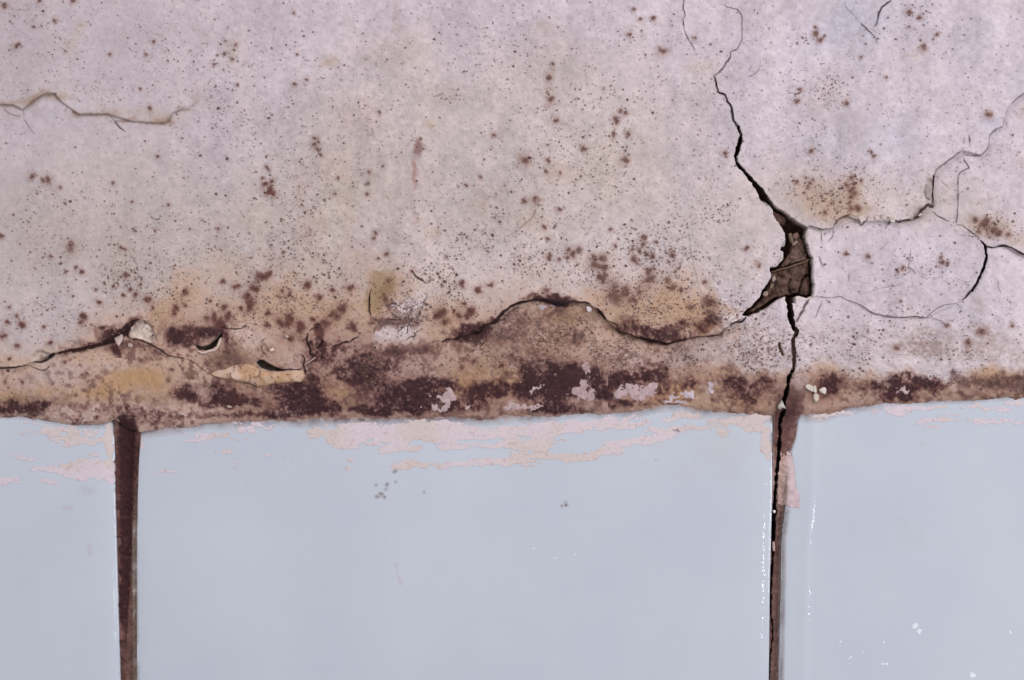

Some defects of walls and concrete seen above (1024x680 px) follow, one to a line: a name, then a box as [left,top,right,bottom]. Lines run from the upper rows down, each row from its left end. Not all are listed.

crack [861,0,892,42]
water stain [411,3,479,104]
crack [714,5,769,205]
crack [0,319,206,371]
flaking render [197,327,305,387]
crack [285,271,431,374]
crack [441,298,747,345]
peeling [54,404,102,424]
crack [769,137,1024,675]